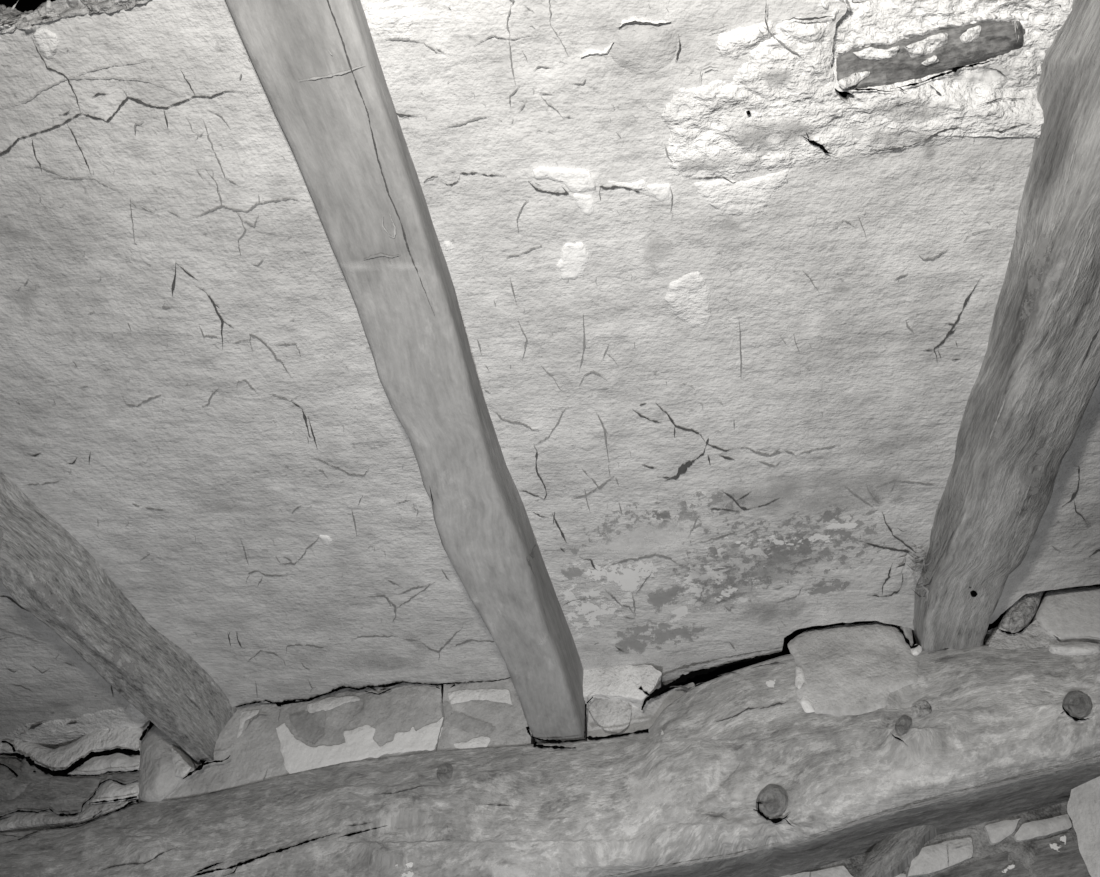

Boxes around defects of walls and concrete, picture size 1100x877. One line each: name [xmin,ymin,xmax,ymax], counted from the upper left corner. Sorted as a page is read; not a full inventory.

spalling [0,0,150,33]
crack [381,0,681,133]
crack [753,4,833,57]
spalling [821,0,1073,138]
crack [0,36,306,266]
crack [599,144,737,212]
crack [163,262,369,536]
crack [477,181,680,619]
crack [635,383,840,481]
peeling [560,523,858,639]
peeling [276,717,443,774]
peeling [454,736,490,749]